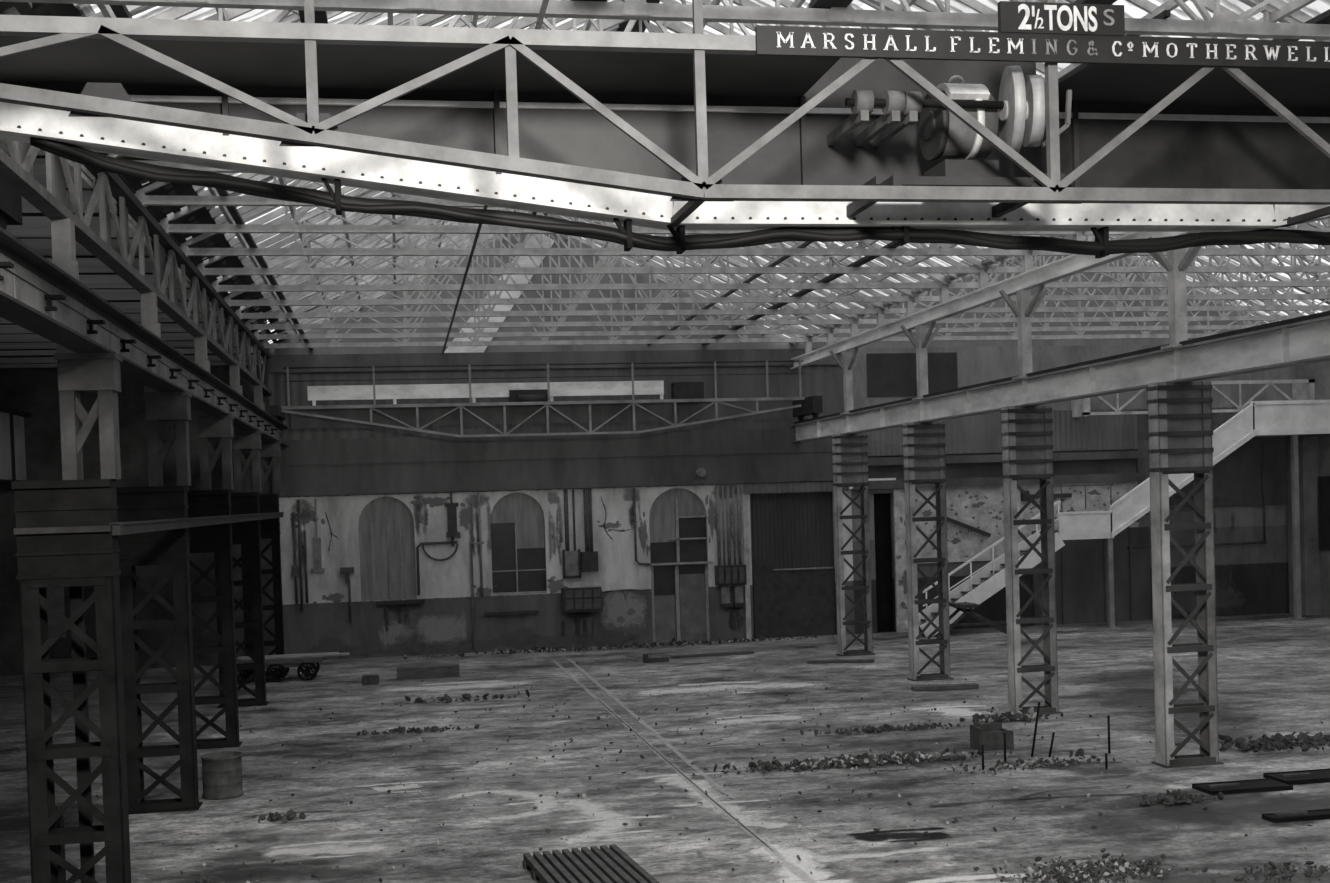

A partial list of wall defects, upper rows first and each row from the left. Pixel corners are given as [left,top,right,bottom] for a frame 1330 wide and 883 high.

damp [311,615,633,657]